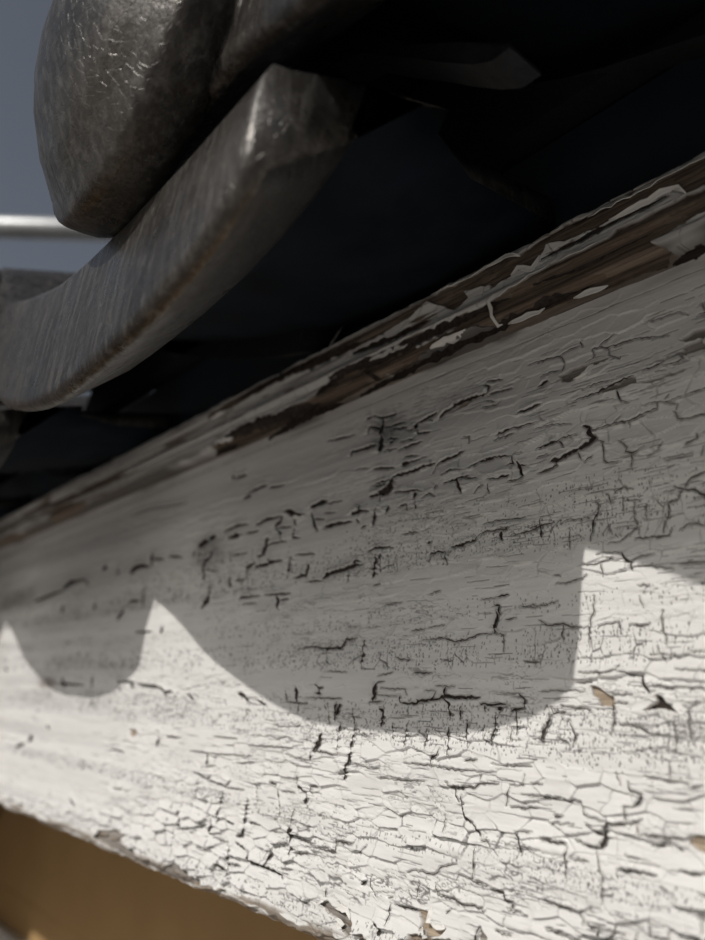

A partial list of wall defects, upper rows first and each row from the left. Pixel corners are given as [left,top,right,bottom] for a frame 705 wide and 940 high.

peeling [209,155,705,457]
crack [34,189,705,940]
peeling [418,908,446,940]